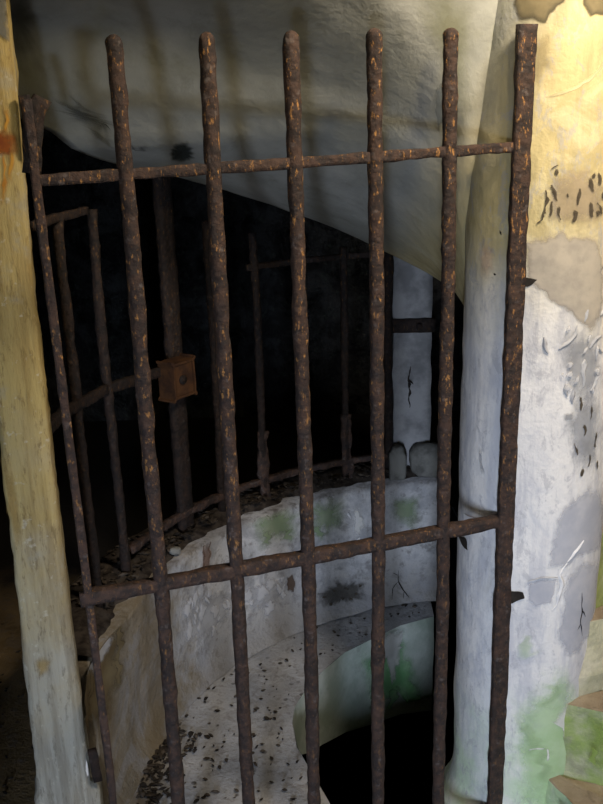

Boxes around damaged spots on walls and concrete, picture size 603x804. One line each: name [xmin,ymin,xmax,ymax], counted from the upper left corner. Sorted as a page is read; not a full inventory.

corrosion [0,112,15,195]
peeling [537,165,603,224]
crack [406,367,414,408]
spalling [527,233,603,477]